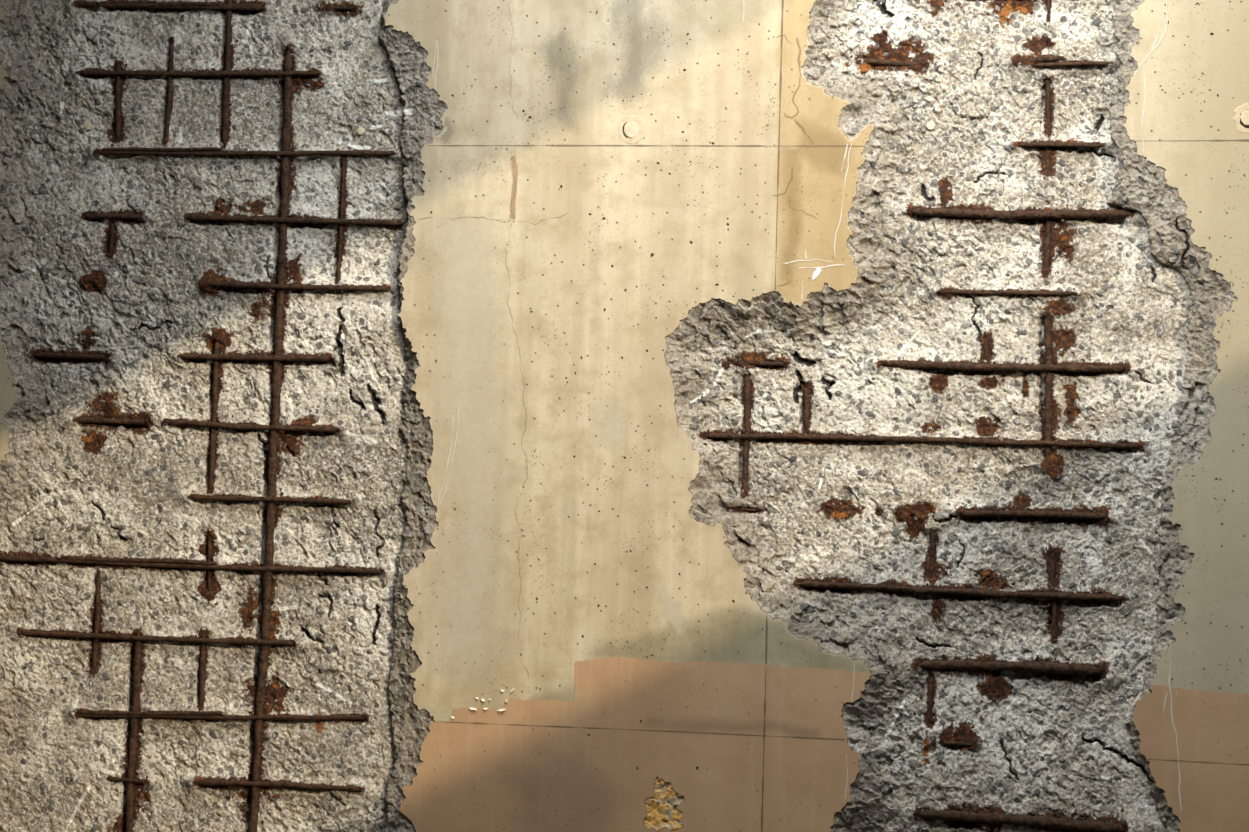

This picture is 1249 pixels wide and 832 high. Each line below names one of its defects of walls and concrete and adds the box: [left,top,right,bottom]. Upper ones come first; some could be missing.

corrosion [924,0,1068,28]
corrosion [845,29,936,80]
corrosion [1018,33,1056,64]
corrosion [937,175,954,208]
corrosion [1037,298,1081,357]
corrosion [81,391,125,457]
spalling [0,0,448,832]
spalling [664,0,1238,832]
corrosion [1059,374,1081,427]
corrosion [816,498,942,542]
corrosion [198,528,222,604]
corrosion [922,670,1018,764]